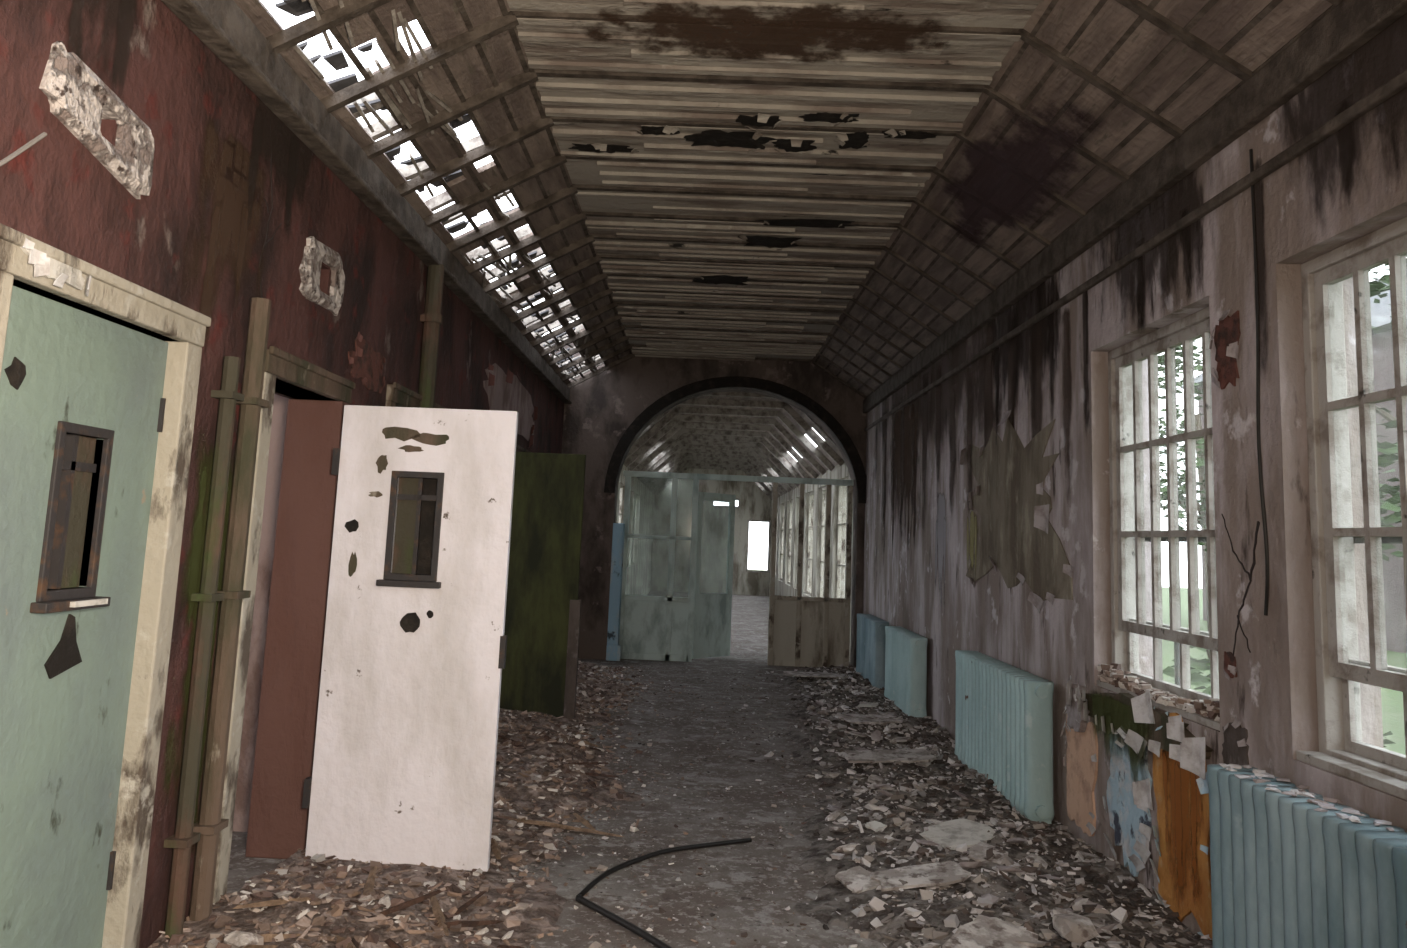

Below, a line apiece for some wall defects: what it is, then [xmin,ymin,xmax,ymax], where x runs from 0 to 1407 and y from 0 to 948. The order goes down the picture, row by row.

damp [1283,13,1407,211]
damp [875,275,1103,602]
damp [1097,171,1203,326]
peeling [1209,310,1241,389]
damp [1253,162,1267,368]
peeling [1060,675,1249,940]